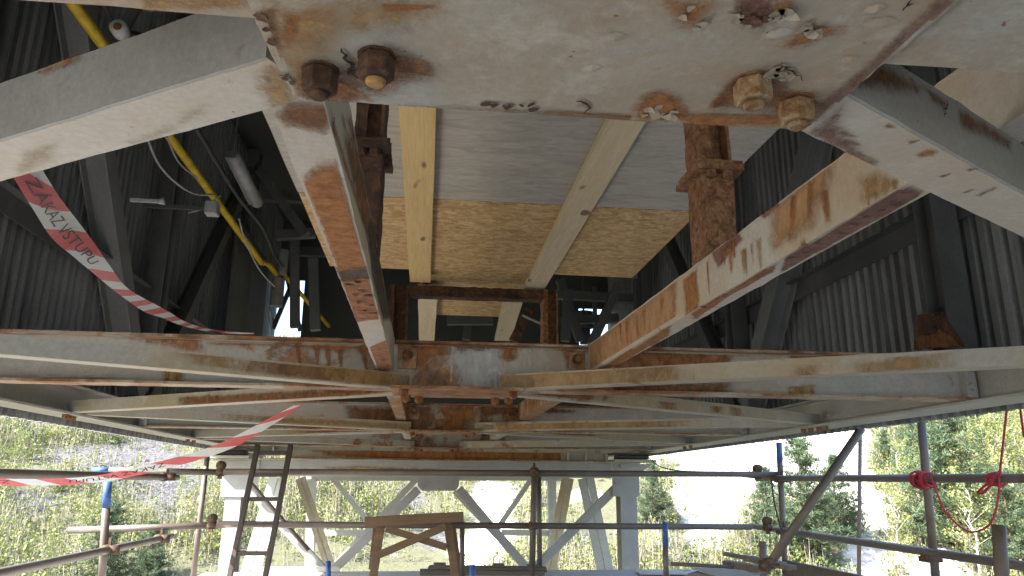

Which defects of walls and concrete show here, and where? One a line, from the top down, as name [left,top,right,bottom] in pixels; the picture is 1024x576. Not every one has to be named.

peeling [728,0,837,48]
rust [413,1,953,165]
peeling [763,62,803,82]
rust [253,3,432,289]
rust [961,113,1009,146]
rust [145,234,761,436]
rust [863,327,960,372]
rust [789,371,813,394]